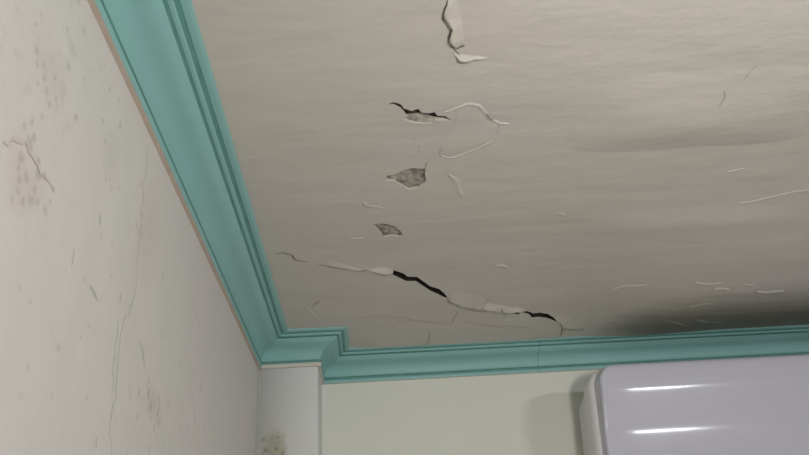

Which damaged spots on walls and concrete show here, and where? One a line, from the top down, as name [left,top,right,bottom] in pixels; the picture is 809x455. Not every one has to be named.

crack [442,0,488,63]
spalling [390,102,450,123]
spalling [386,163,427,190]
spalling [374,223,402,237]
crack [110,151,148,455]
crack [274,253,589,345]